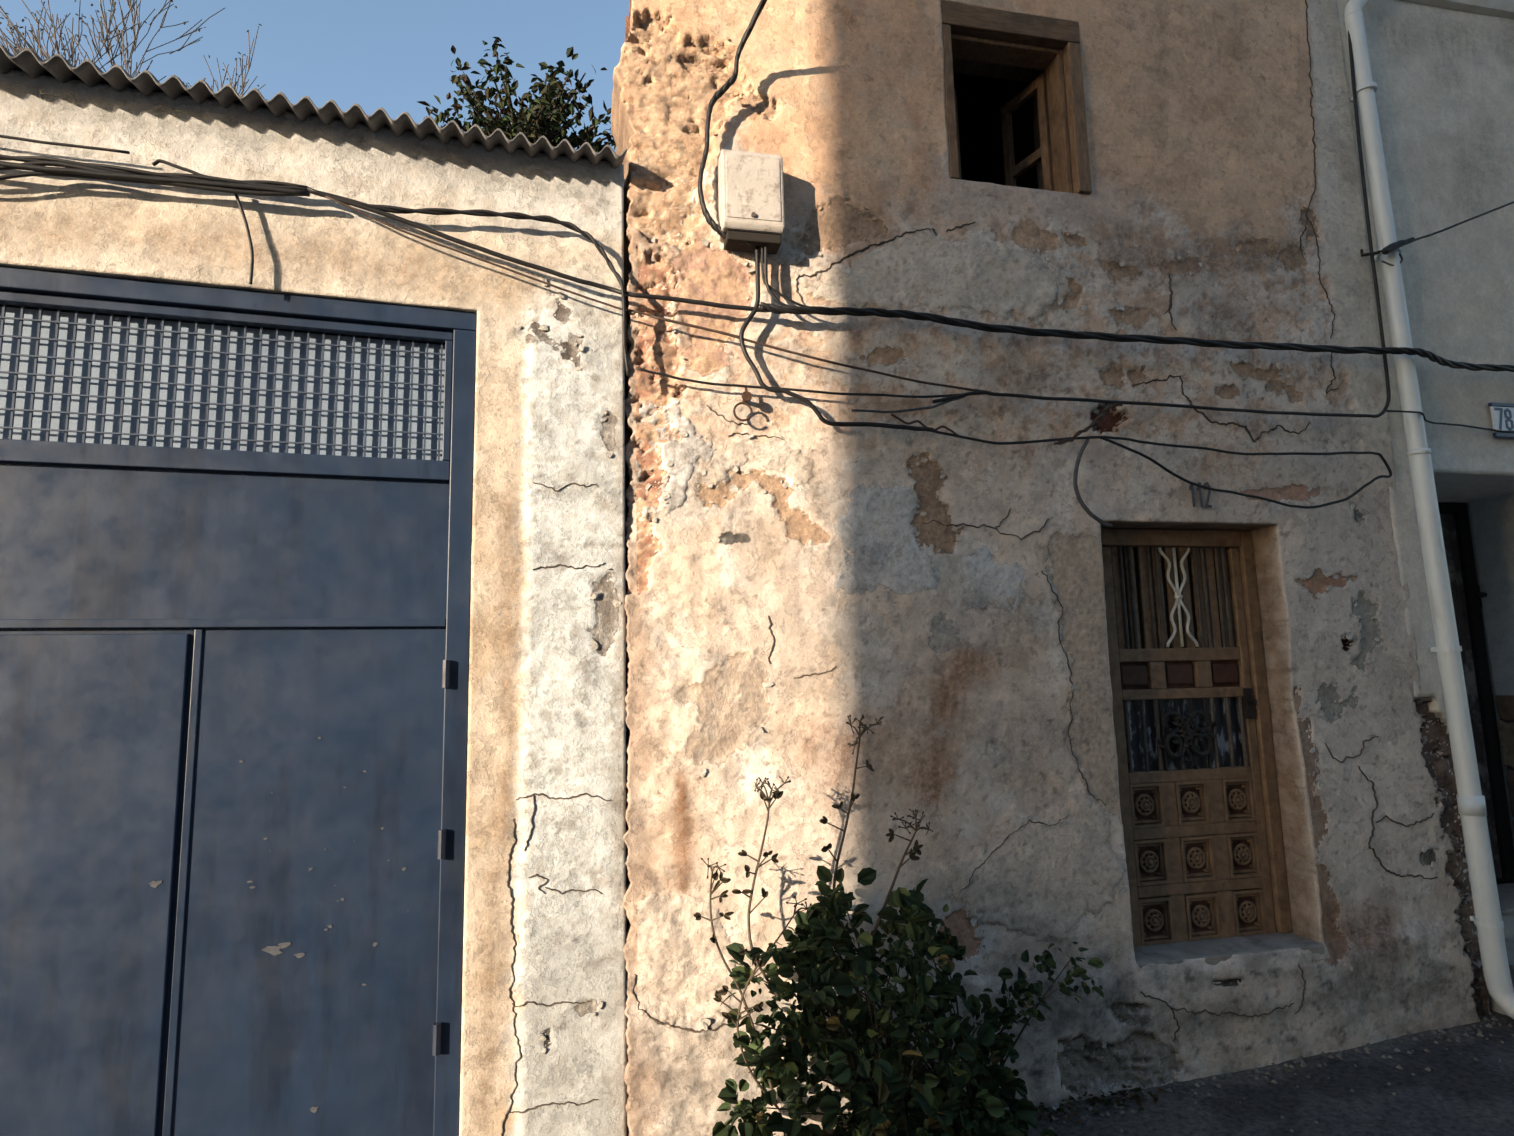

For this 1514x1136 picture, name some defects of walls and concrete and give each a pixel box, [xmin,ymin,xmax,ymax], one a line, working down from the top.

peeling [519,278,584,371]
spalling [624,11,964,597]
crack [796,221,976,305]
crack [1132,0,1339,442]
crack [533,482,598,492]
crack [533,562,604,570]
peeling [586,568,621,656]
peeling [674,652,778,777]
peeling [1035,531,1121,824]
crack [1325,735,1438,880]
spalling [1413,699,1490,1016]
crack [501,793,611,1136]